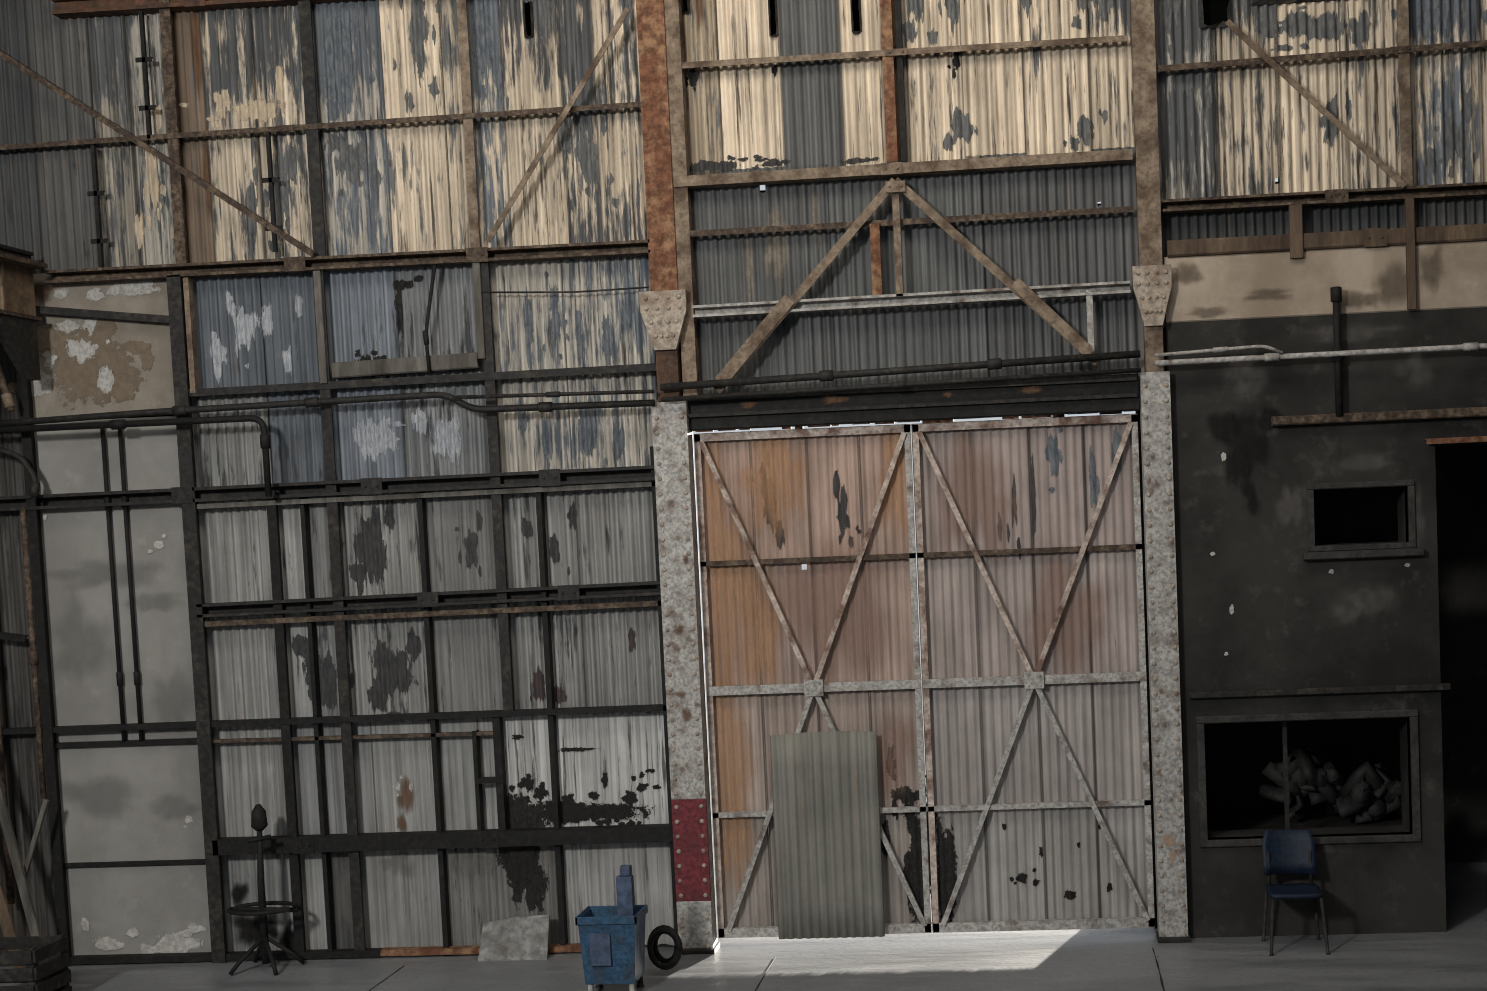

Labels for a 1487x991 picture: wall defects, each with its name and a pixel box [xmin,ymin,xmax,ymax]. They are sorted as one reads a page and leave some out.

peeling [393,0,440,113]
peeling [902,0,965,79]
peeling [1254,4,1371,51]
peeling [133,150,174,249]
peeling [207,65,286,128]
peeling [559,117,619,212]
peeling [943,107,978,151]
peeling [1063,109,1108,152]
peeling [1319,88,1352,148]
peeling [210,291,273,385]
peeling [833,469,861,547]
peeling [292,626,421,714]